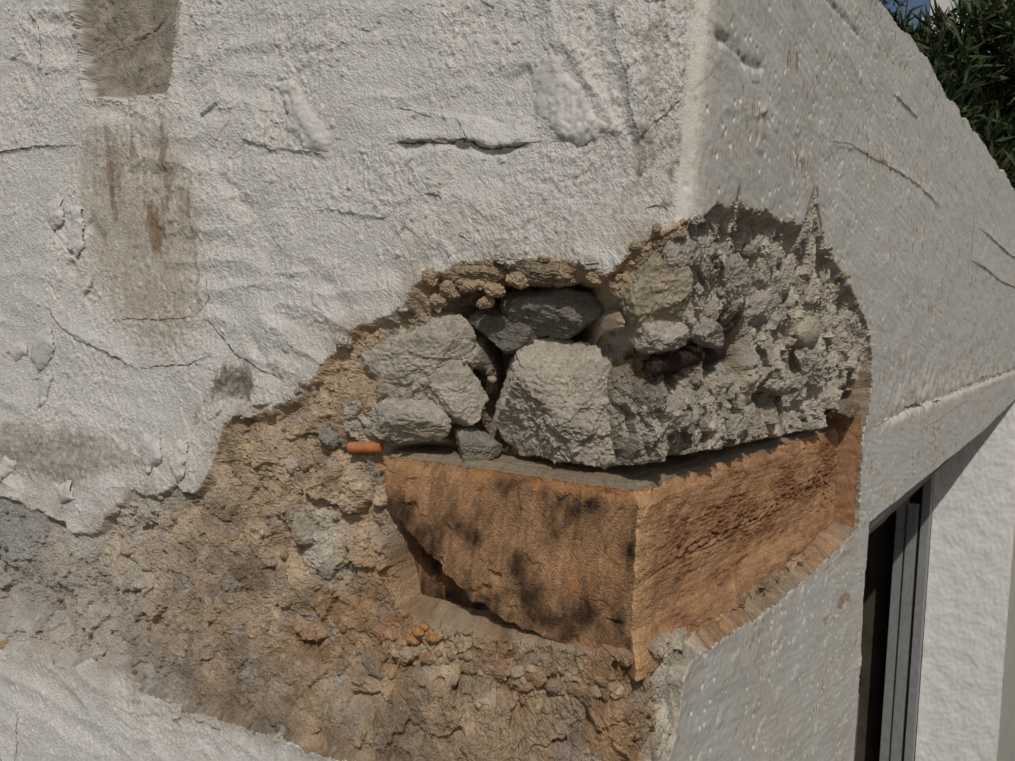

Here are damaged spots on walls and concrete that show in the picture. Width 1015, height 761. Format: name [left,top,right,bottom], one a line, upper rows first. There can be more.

crack [0,144,77,158]
crack [387,118,541,150]
crack [831,140,939,206]
crack [971,213,1015,288]
spalling [0,95,876,761]